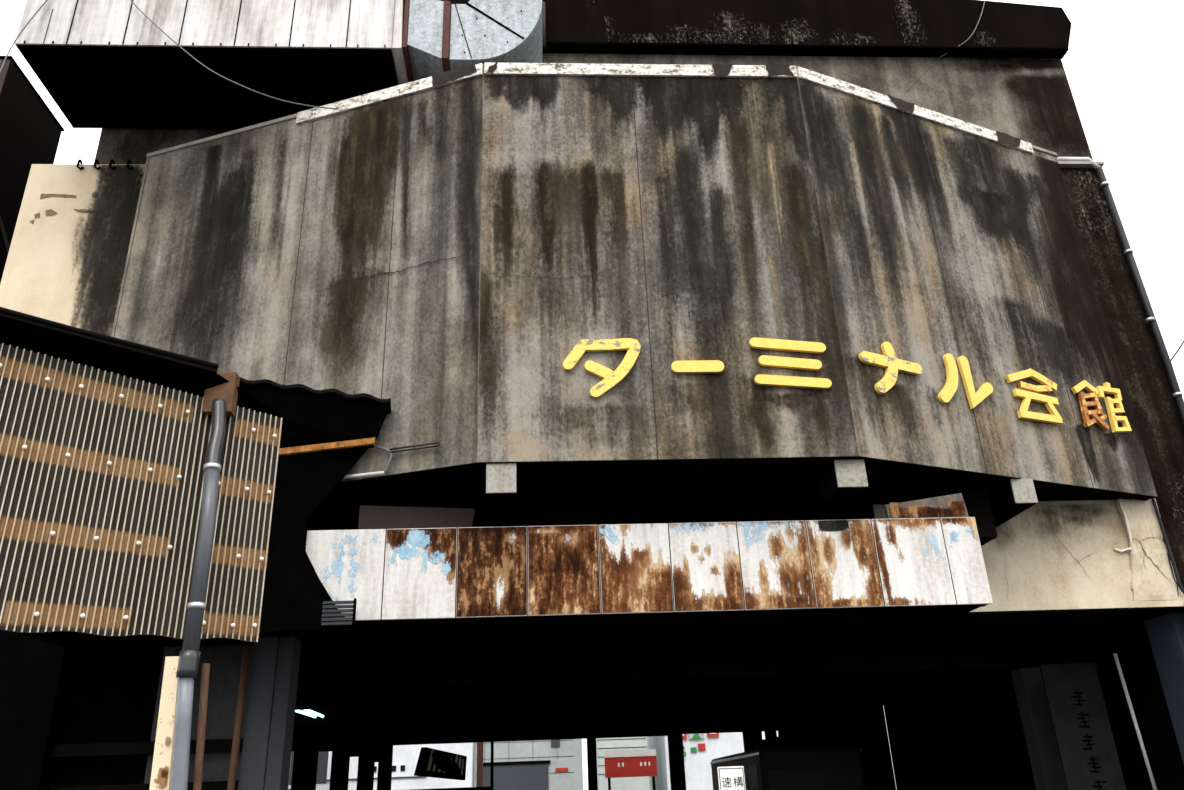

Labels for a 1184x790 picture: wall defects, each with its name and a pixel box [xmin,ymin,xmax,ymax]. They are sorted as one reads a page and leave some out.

leakage [71,128,176,336]
leakage [169,129,289,361]
leakage [314,75,636,424]
leakage [582,58,1155,487]
leakage [560,404,643,442]
peeling [599,525,619,544]
rust [386,501,978,617]
peeling [674,523,714,533]
crack [1136,537,1179,596]